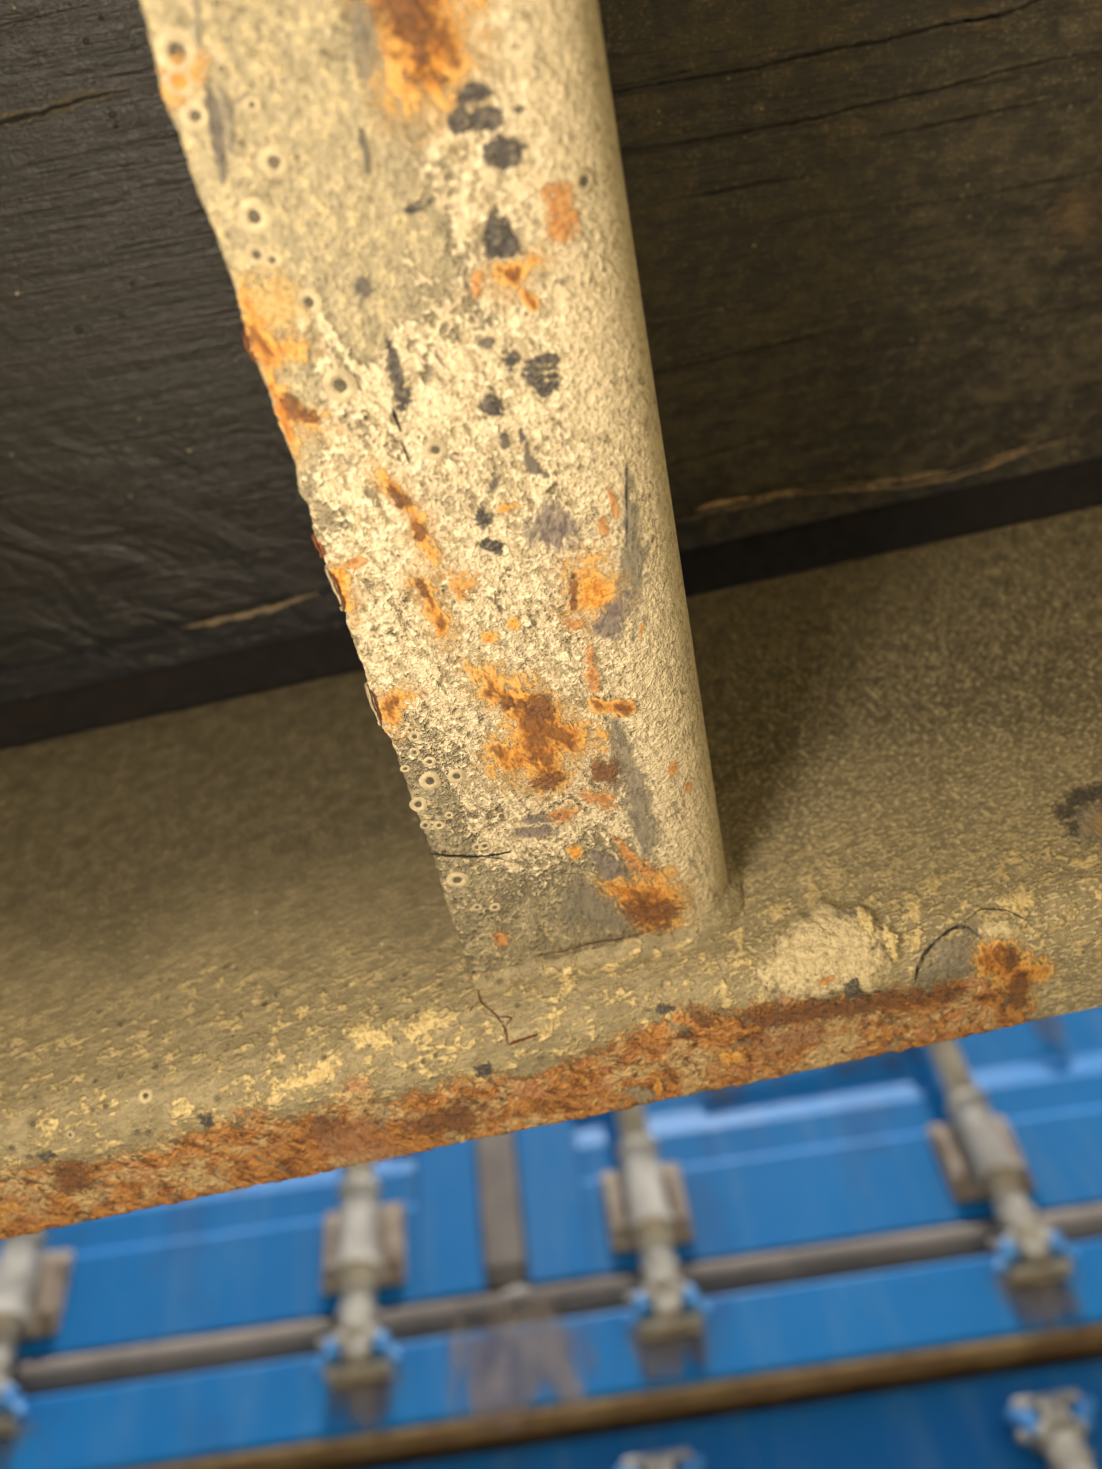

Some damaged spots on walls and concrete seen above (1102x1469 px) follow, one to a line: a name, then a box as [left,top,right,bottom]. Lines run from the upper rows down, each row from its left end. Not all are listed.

rust [363,0,488,127]
rust [235,267,329,455]
rust [463,488,636,825]
peeling [1050,781,1102,845]
rust [596,837,691,935]
crack [914,908,1029,984]
crack [469,990,538,1045]
rust [0,935,1059,1240]